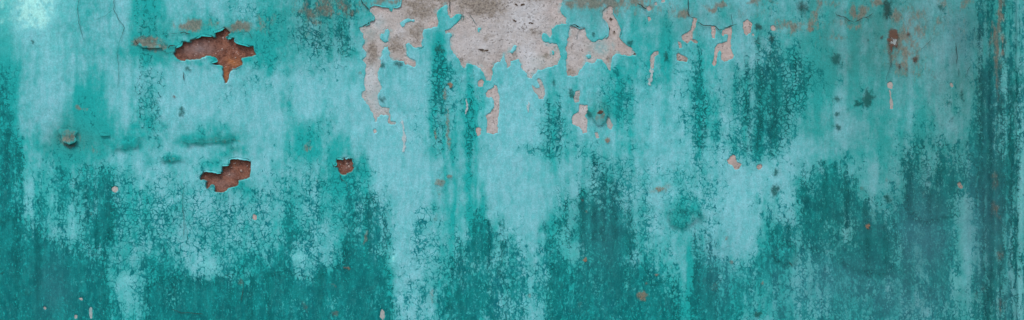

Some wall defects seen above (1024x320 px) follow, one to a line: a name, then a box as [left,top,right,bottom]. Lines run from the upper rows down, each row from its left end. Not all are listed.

leakage [433,42,446,156]
peeling [360,0,636,138]
peeling [676,18,698,62]
peeling [711,20,754,66]
rust [881,29,910,52]
leakage [903,0,1021,320]
leakage [0,165,118,320]
leakage [145,271,253,320]
leakage [266,196,393,320]
leakage [446,217,510,320]
leakage [547,163,722,320]
leakage [771,162,901,278]